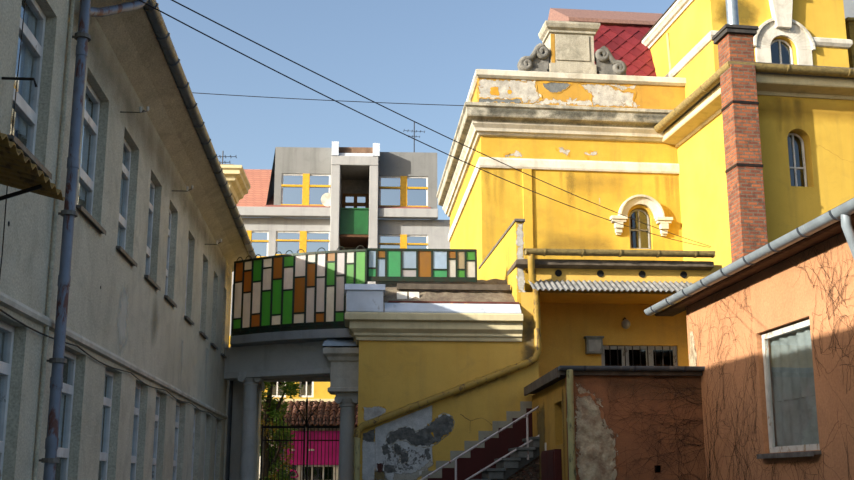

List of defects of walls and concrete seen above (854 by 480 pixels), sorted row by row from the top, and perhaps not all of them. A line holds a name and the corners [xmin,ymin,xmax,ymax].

peeling [477,78,640,108]
spalling [362,401,545,480]
spalling [574,382,619,480]